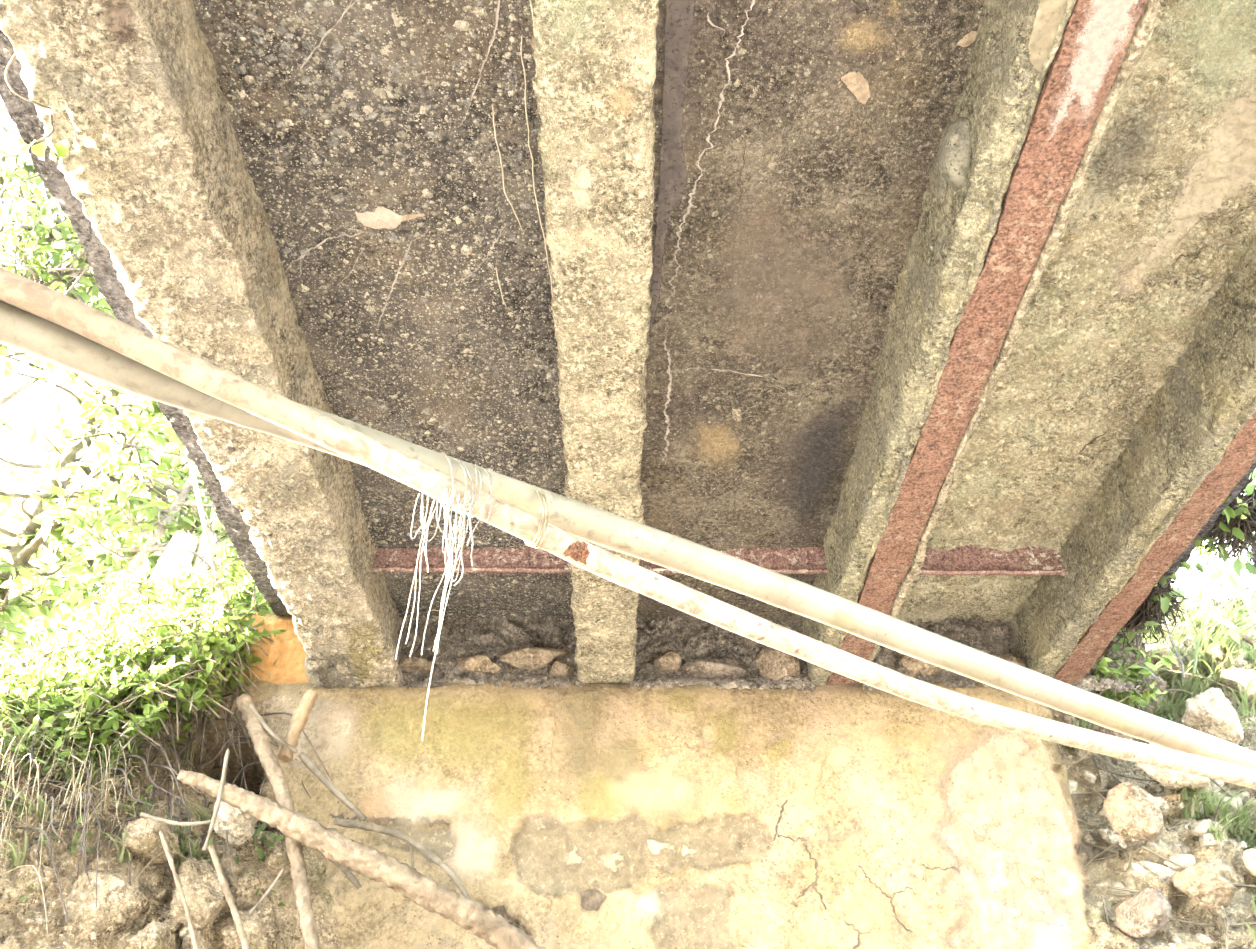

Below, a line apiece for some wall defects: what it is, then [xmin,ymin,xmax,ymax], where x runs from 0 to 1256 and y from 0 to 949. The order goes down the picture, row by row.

crack [658,0,794,465]
spalling [511,813,773,949]
crack [765,749,959,949]